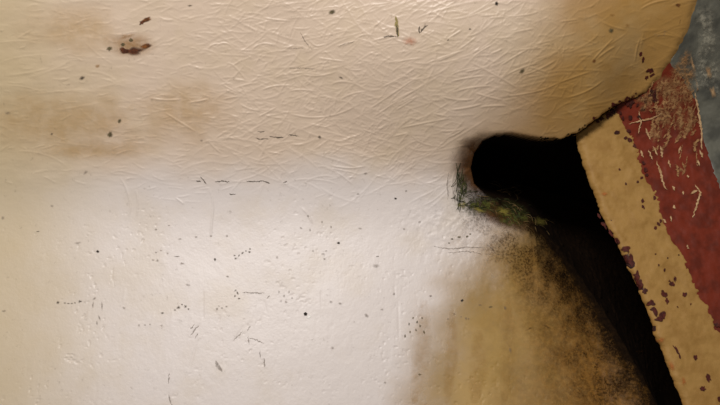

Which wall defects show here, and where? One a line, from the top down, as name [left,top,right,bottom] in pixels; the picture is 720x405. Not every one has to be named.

corrosion [120,38,151,54]
peeling [593,89,658,123]
leakage [421,226,649,405]
peeling [597,213,676,322]